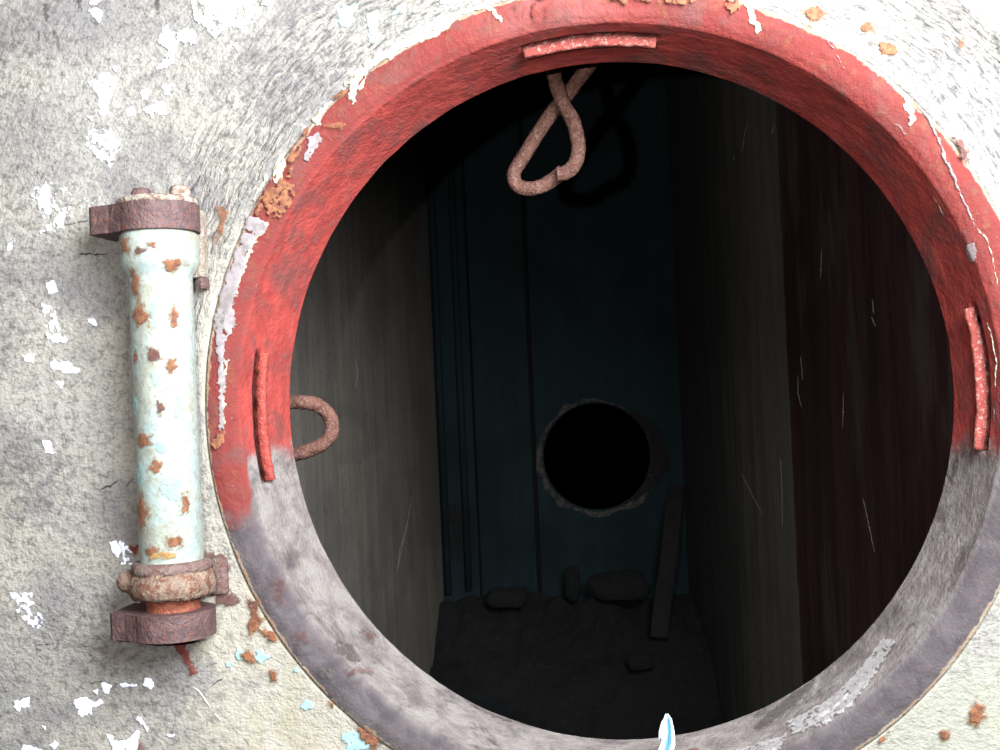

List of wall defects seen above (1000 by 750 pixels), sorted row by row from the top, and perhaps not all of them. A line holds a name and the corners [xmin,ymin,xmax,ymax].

peeling [335,0,502,104]
peeling [304,101,333,161]
rust [162,258,183,272]
rust [130,267,151,328]
peeling [210,153,286,449]
rust [134,346,178,374]
rust [129,536,183,560]
peeling [10,592,42,629]
rust [213,588,279,641]
rust [174,643,198,676]
peeling [73,678,154,717]
peeling [106,716,149,750]